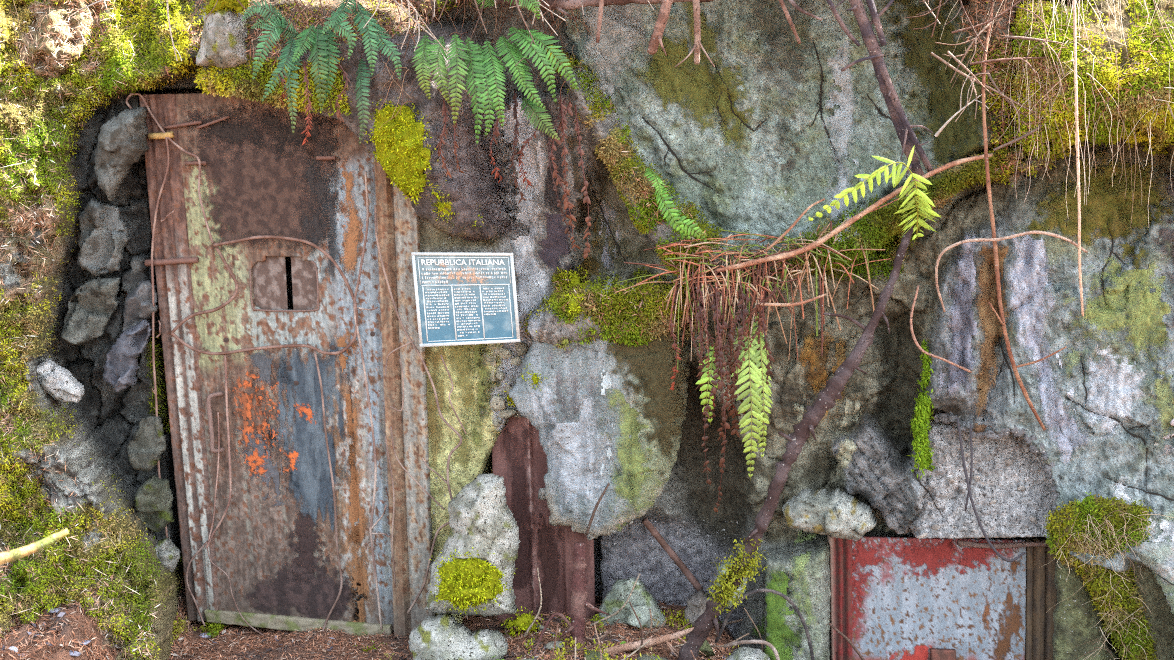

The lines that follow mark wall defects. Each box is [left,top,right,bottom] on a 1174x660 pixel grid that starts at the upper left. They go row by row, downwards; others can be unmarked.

rust [188,103,363,276]
rust [337,332,357,372]
rust [246,388,371,622]
peeling [890,645,932,660]
rust [982,561,1022,660]